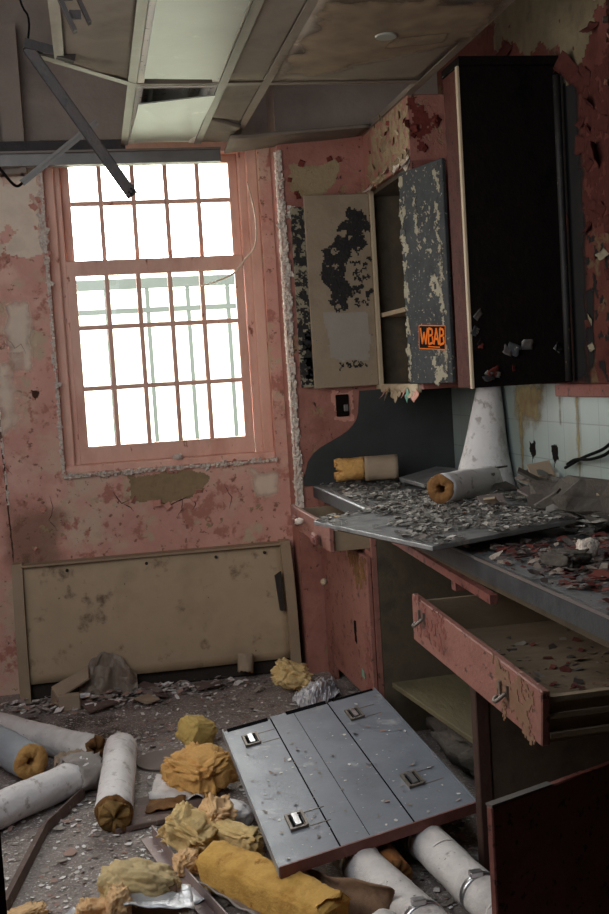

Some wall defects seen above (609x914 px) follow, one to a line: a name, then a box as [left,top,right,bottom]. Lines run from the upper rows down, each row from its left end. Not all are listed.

water stain [280,0,499,76]
peeling [493,0,609,86]
peeling [363,97,442,196]
peeling [0,168,278,515]
flaking render [273,149,341,508]
peeling [584,235,609,382]
peeling [331,390,354,422]